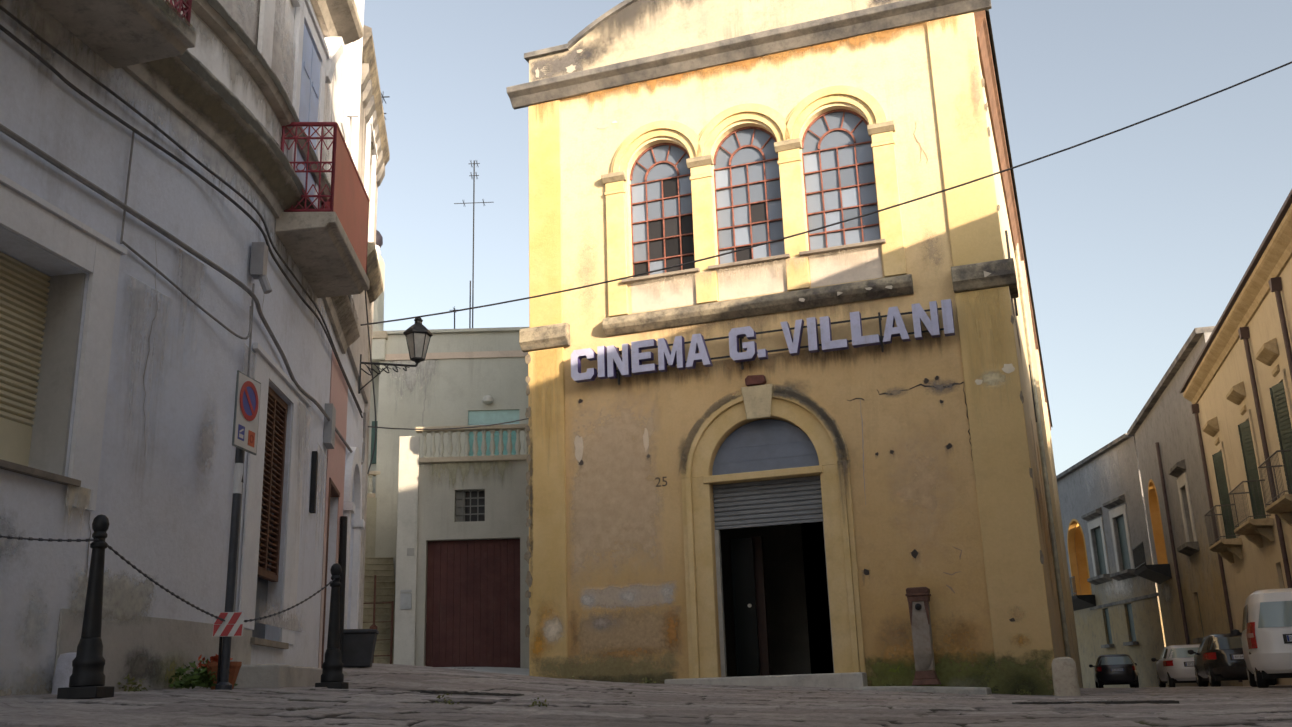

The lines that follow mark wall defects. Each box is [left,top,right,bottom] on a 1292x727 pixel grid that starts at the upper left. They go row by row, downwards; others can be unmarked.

leakage [532,0,659,80]
leakage [586,26,907,99]
crack [848,382,973,501]
leakage [572,609,679,658]
leakage [934,632,1054,695]